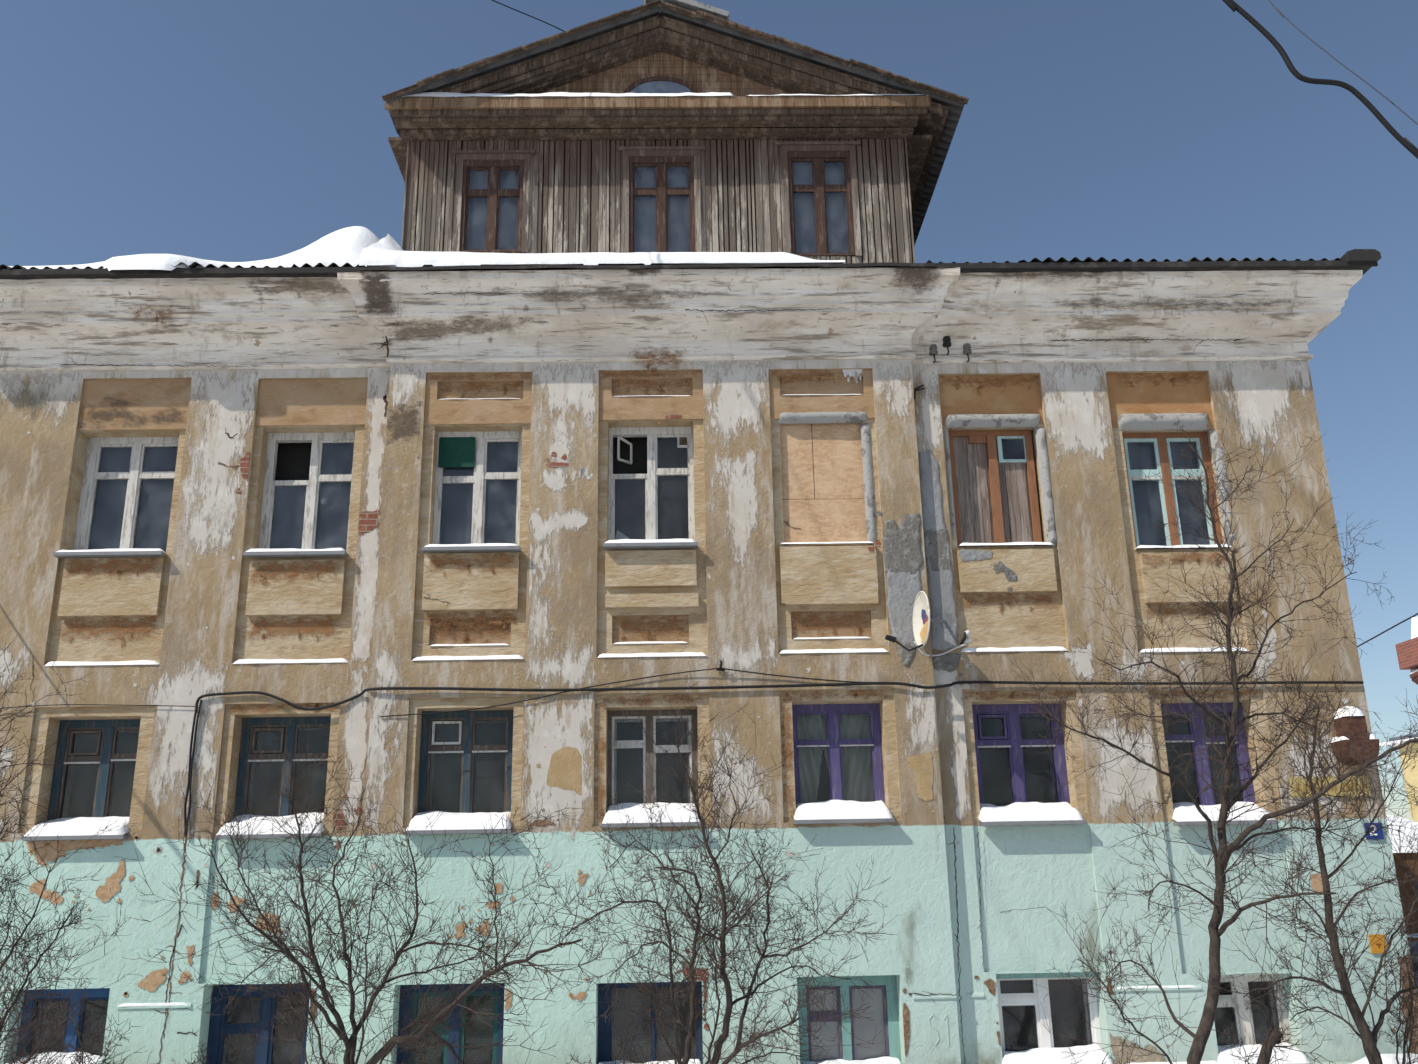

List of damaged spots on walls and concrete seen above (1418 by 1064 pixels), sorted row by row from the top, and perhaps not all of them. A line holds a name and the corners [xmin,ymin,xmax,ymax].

spalling [360,271,396,314]
peeling [0,371,257,567]
peeling [691,362,773,576]
peeling [1216,360,1310,459]
peeling [333,365,420,859]
peeling [513,364,598,840]
peeling [133,658,228,834]
peeling [905,657,975,820]
peeling [447,883,515,946]
peeling [568,978,588,1001]